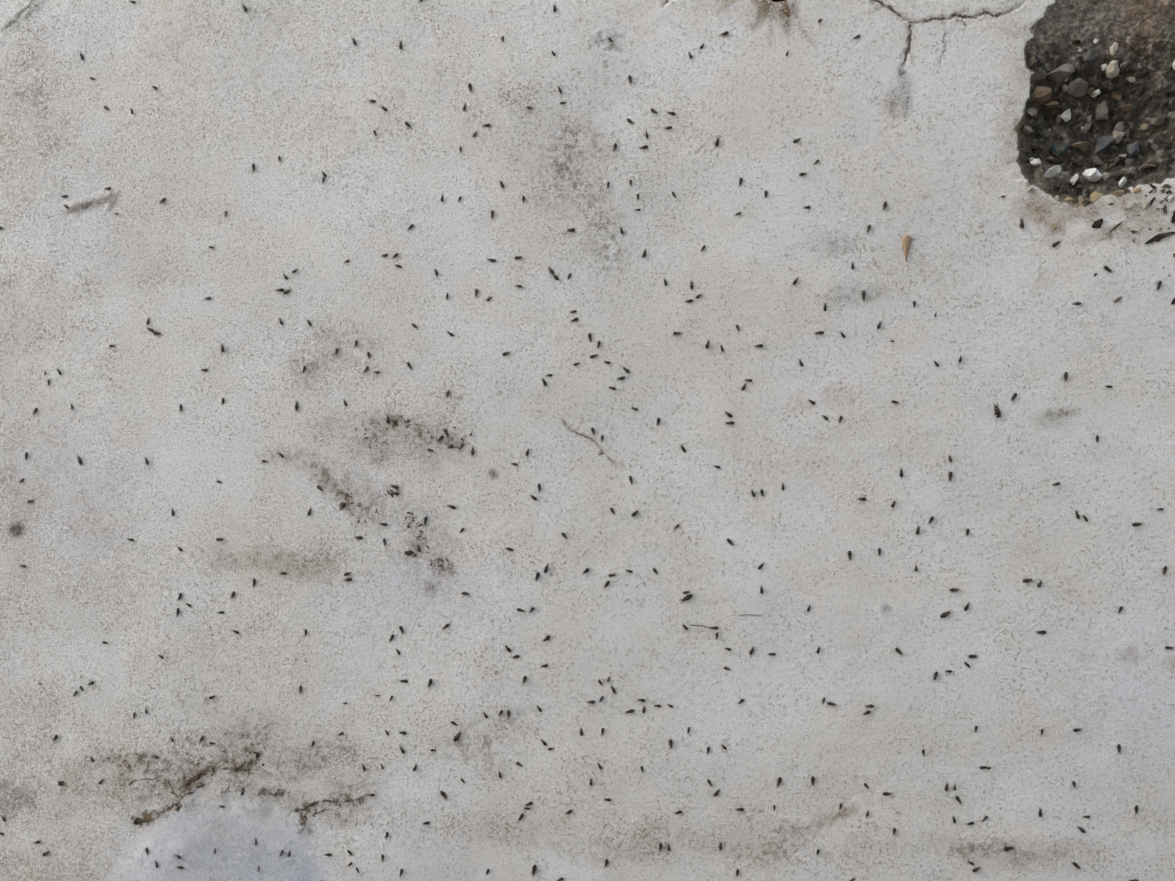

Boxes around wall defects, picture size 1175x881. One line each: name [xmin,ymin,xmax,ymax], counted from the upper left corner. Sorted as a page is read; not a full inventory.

crack [871,0,1012,63]
spalling [1015,0,1175,221]